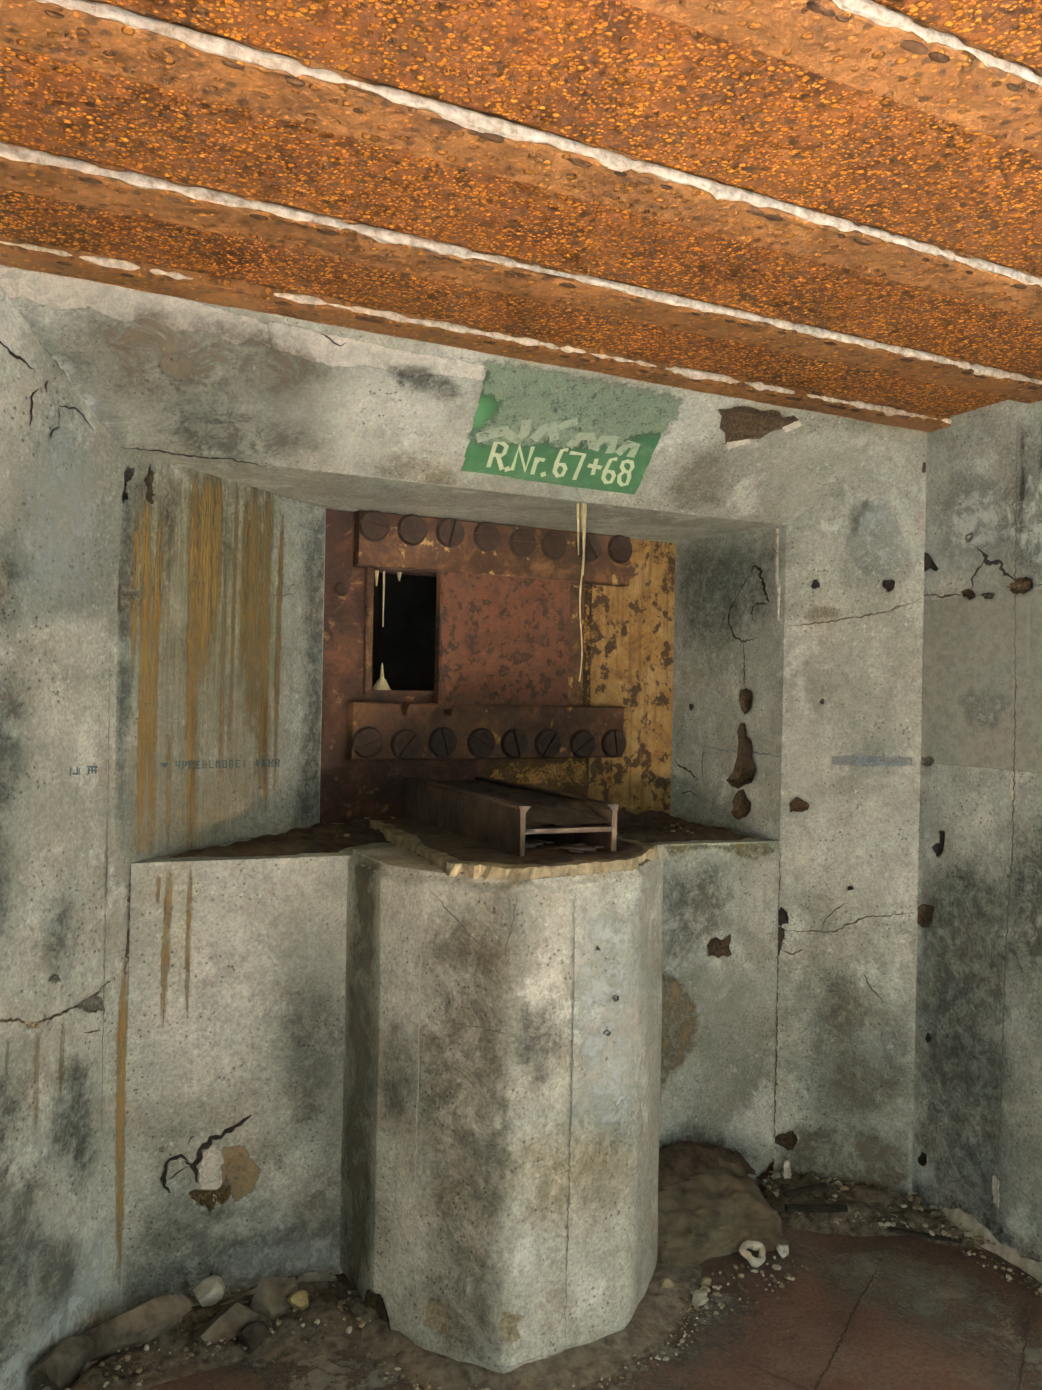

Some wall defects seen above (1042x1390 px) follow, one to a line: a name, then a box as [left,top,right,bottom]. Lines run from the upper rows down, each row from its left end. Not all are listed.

rust [430,119,504,143]
crack [0,330,266,467]
spalling [718,406,803,449]
rust [131,473,284,852]
spalling [726,688,756,820]
crack [728,420,1042,1219]
water stain [0,1170,102,1390]
rust [115,961,127,1284]
crack [160,1114,252,1193]
peeling [189,1145,260,1212]
water stain [230,863,403,1293]
water stain [781,827,1042,1262]